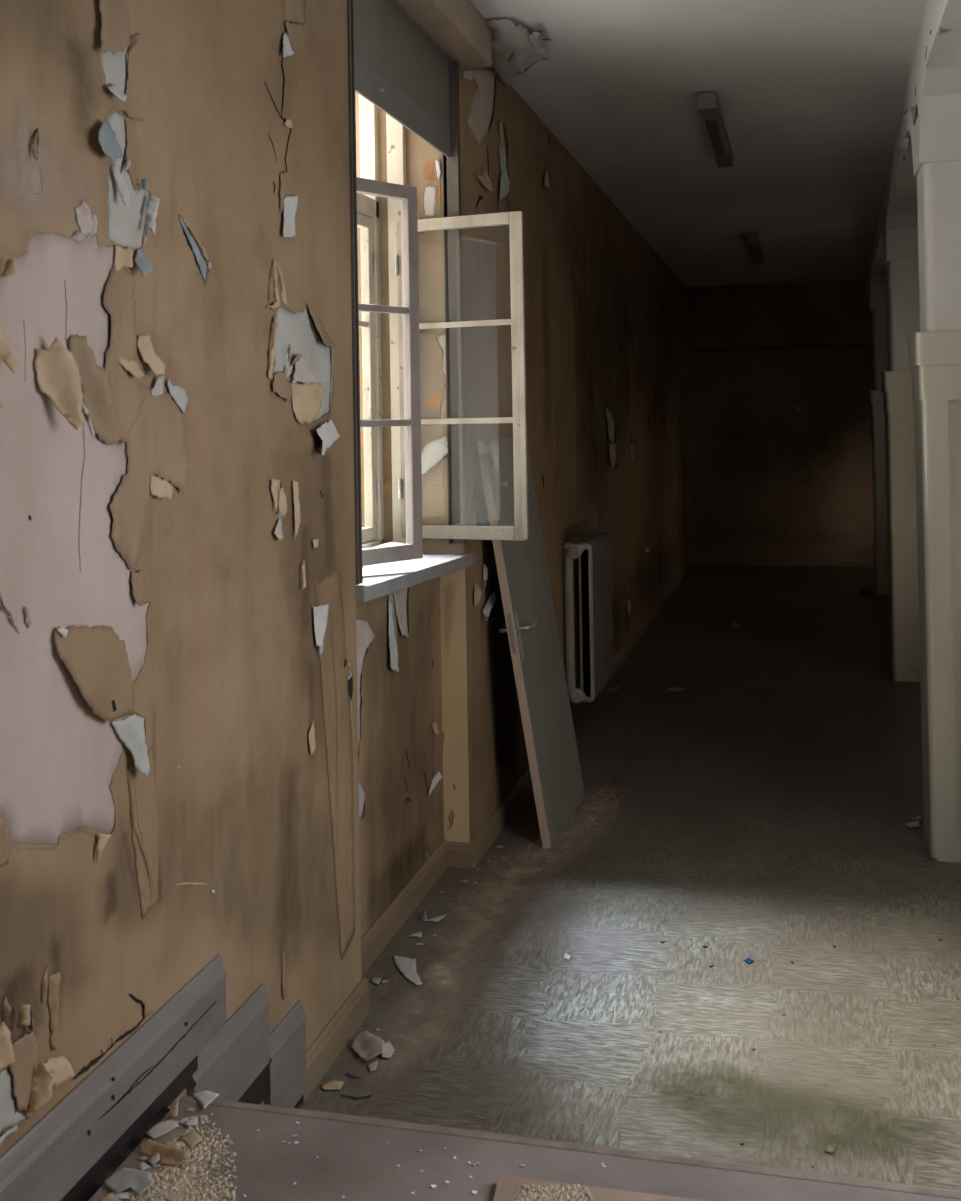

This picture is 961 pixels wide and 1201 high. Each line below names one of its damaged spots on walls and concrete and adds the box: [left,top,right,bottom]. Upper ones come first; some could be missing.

peeling [283,0,307,57]
peeling [463,67,510,210]
peeling [176,207,211,287]
peeling [267,260,340,456]
peeling [0,0,190,867]
peeling [313,604,329,655]
peeling [344,587,410,766]
peeling [0,965,75,1145]
crack [73,994,217,1135]